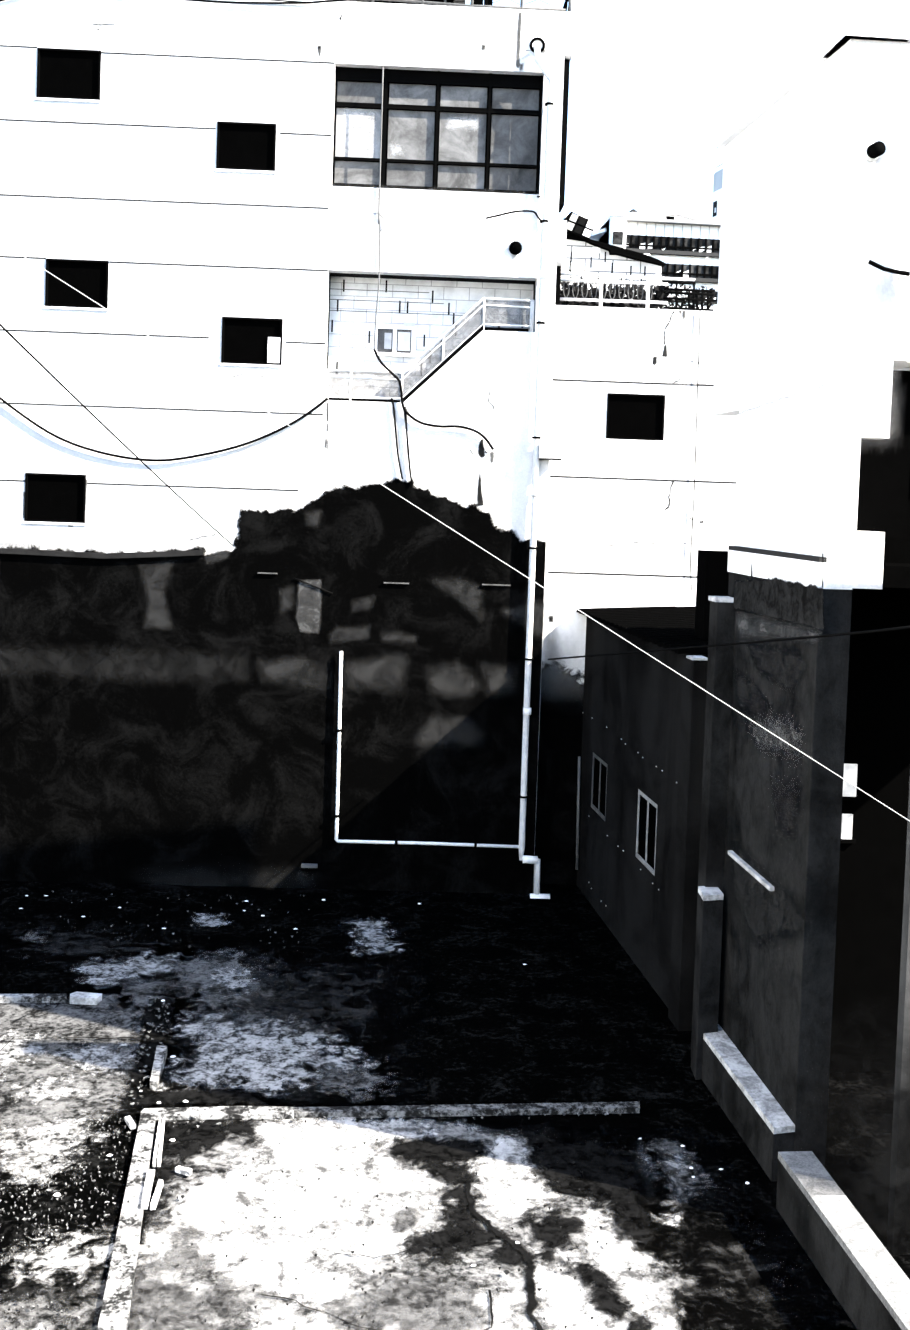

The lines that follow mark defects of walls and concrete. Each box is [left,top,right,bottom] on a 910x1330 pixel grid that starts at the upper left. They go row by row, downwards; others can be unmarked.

crack [88,22,155,30]
crack [664,473,704,523]